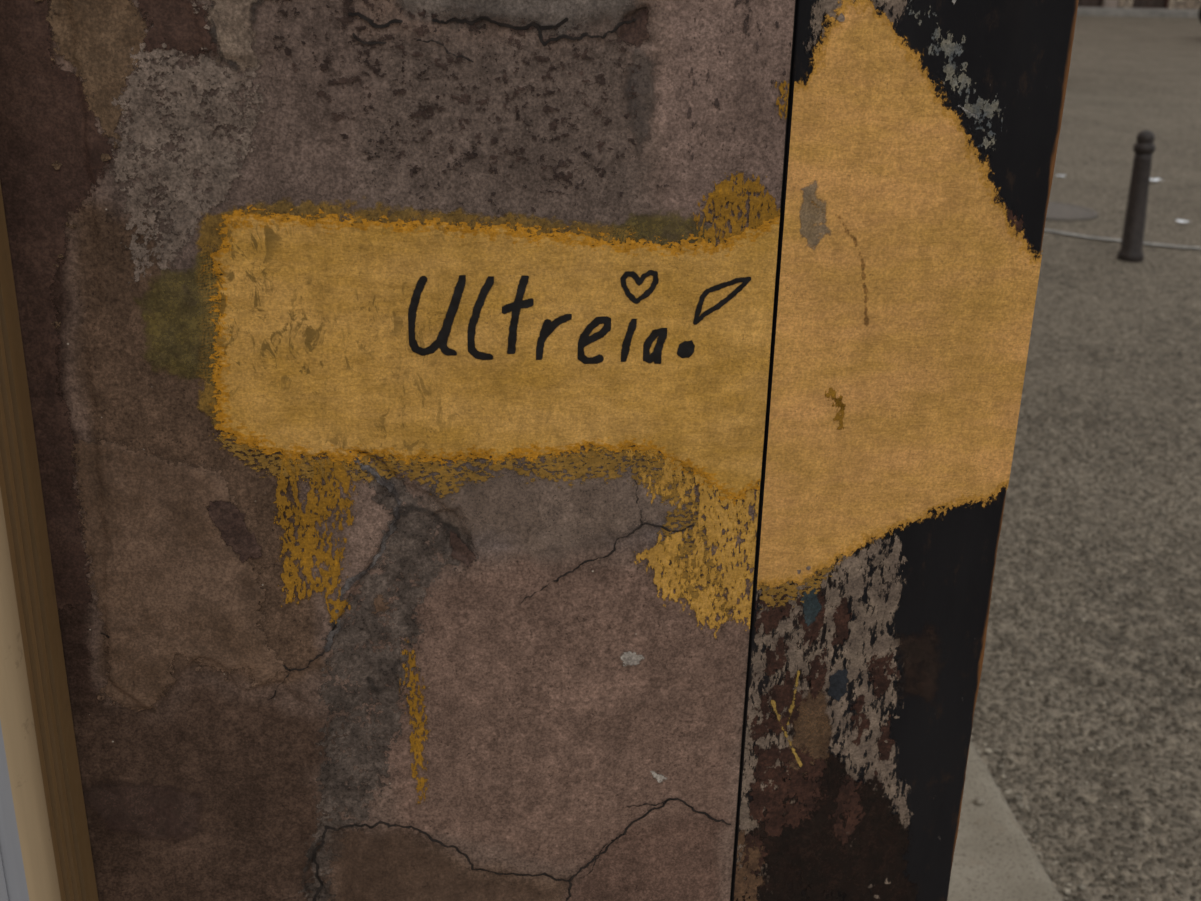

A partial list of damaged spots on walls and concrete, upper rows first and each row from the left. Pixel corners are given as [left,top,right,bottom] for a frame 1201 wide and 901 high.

crack [348,12,635,62]
spalling [728,0,786,90]
peeling [789,0,855,52]
peeling [871,0,1003,151]
crack [521,479,695,603]
peeling [626,449,913,896]
crack [312,798,731,901]